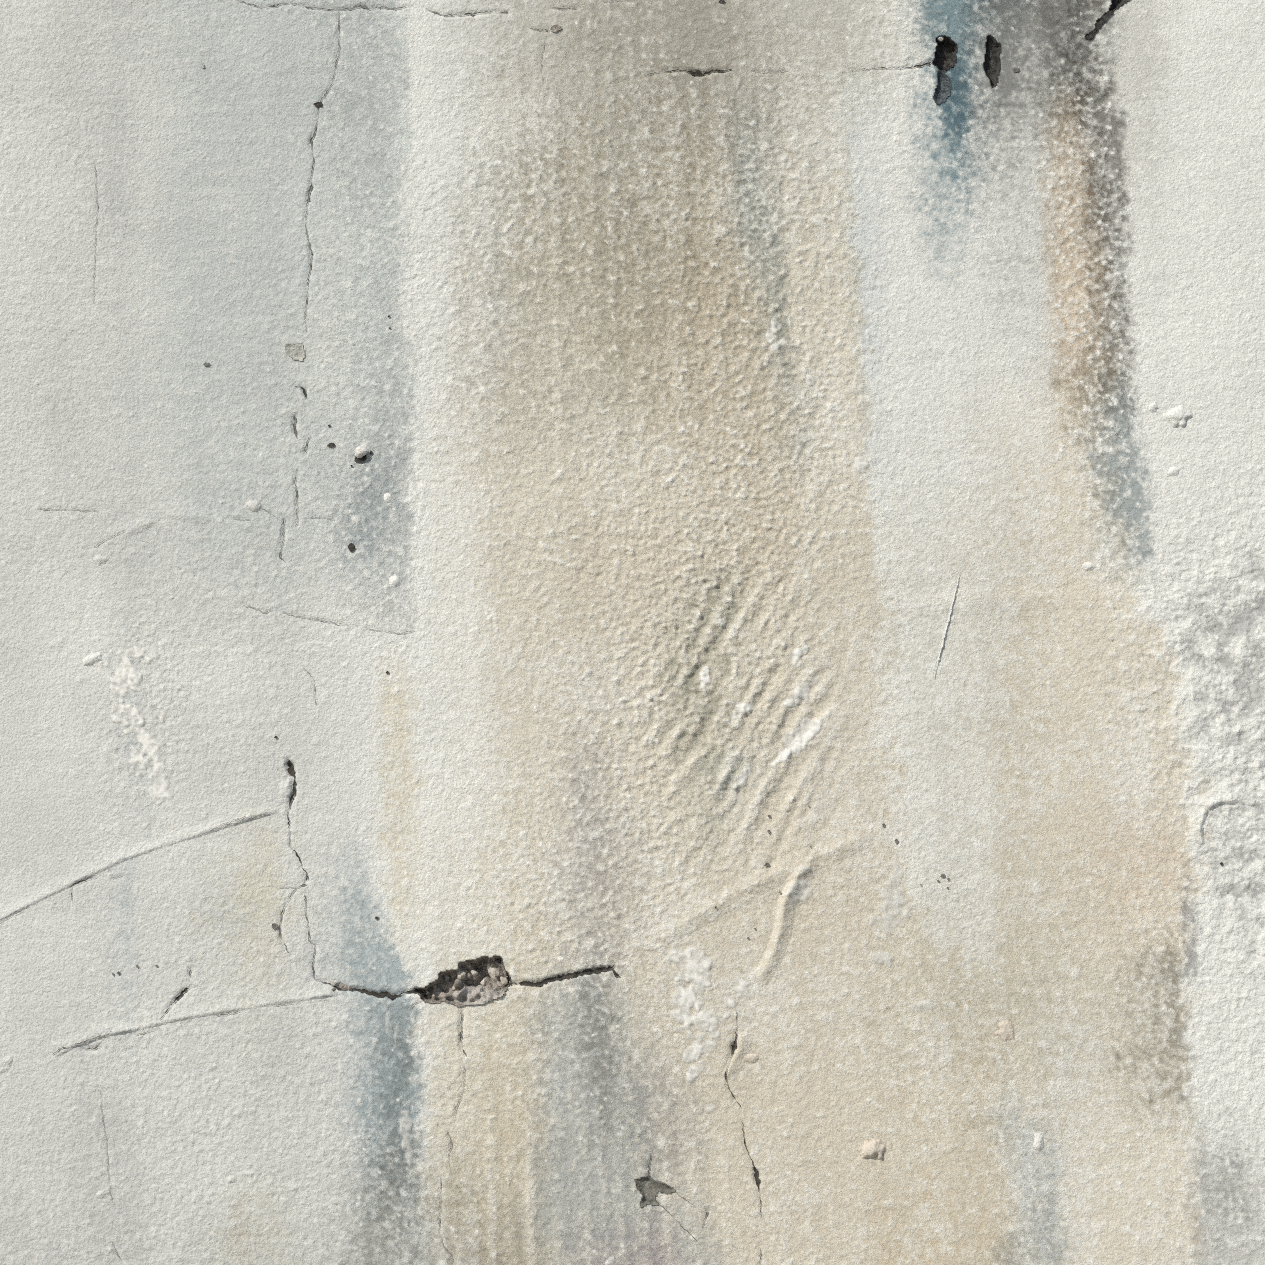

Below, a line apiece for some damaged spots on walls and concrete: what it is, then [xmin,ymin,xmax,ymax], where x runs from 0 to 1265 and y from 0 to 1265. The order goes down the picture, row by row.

water stain [989,0,1123,160]
crack [238,0,576,332]
crack [234,386,334,562]
crack [211,760,420,1009]
crack [52,1034,104,1055]
spalling [414,956,511,1007]
crack [508,965,620,987]
spalling [634,1175,675,1207]
crack [724,1011,761,1213]